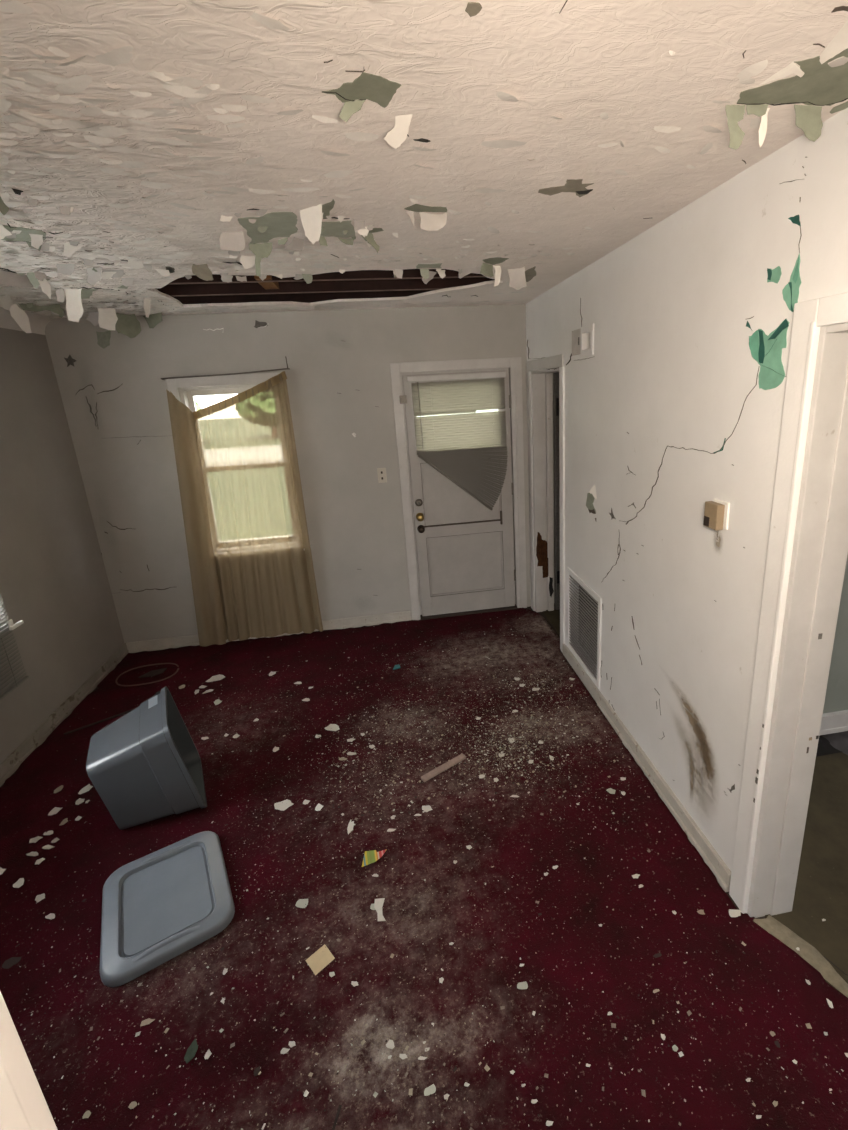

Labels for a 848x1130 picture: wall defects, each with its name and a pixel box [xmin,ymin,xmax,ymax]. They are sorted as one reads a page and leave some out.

peeling [465,2,482,17]
peeling [700,20,848,164]
peeling [0,46,575,349]
peeling [538,179,594,197]
peeling [746,253,801,390]
crack [603,366,760,579]
leakage [682,699,714,789]